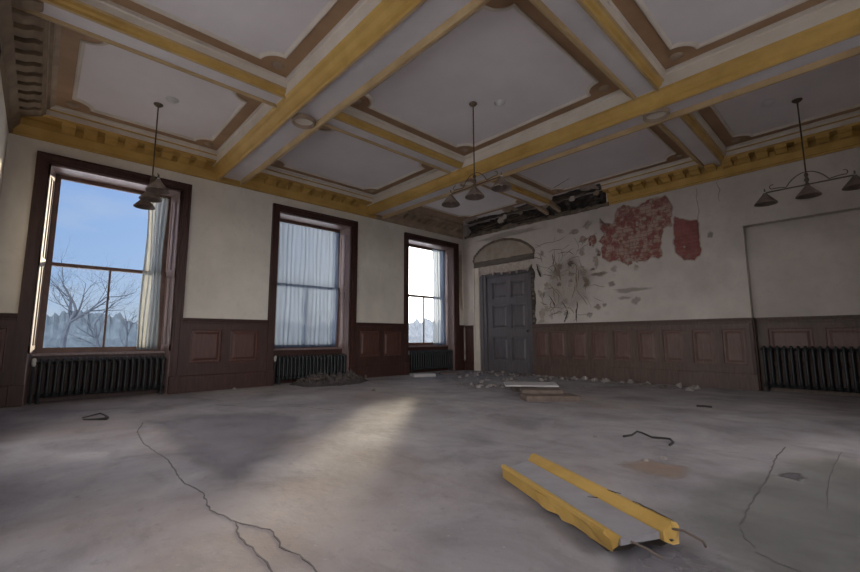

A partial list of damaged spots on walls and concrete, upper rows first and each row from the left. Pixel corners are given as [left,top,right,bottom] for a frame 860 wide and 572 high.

spalling [557,195,703,272]
crack [137,422,317,572]
crack [739,447,803,572]